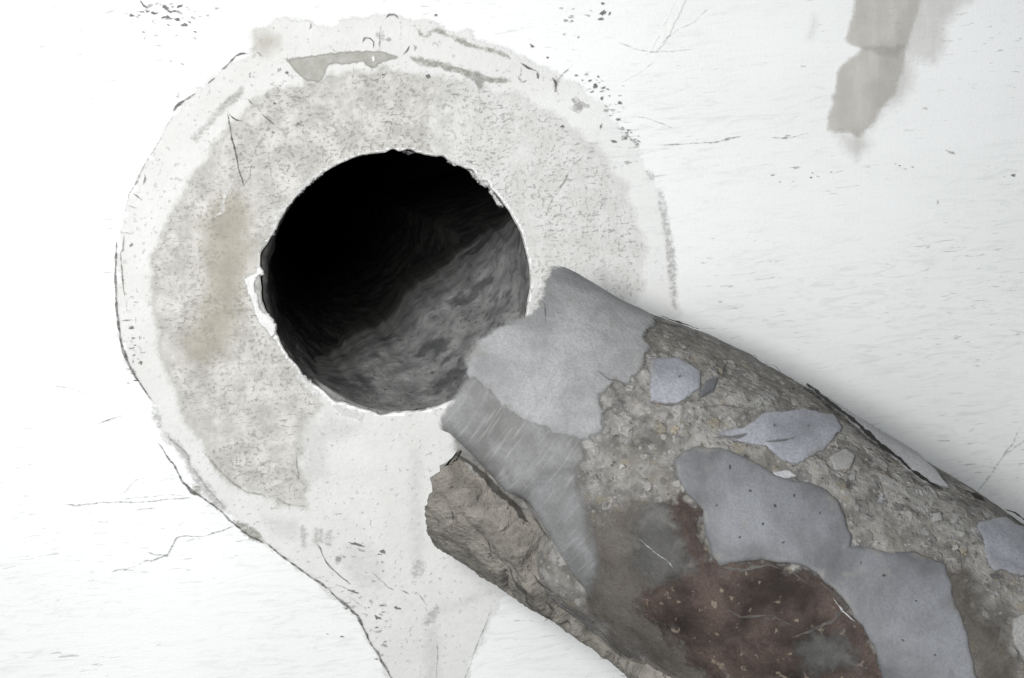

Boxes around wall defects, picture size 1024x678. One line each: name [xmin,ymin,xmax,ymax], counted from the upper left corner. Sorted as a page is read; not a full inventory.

water stain [829,0,918,145]
water stain [573,499,711,678]